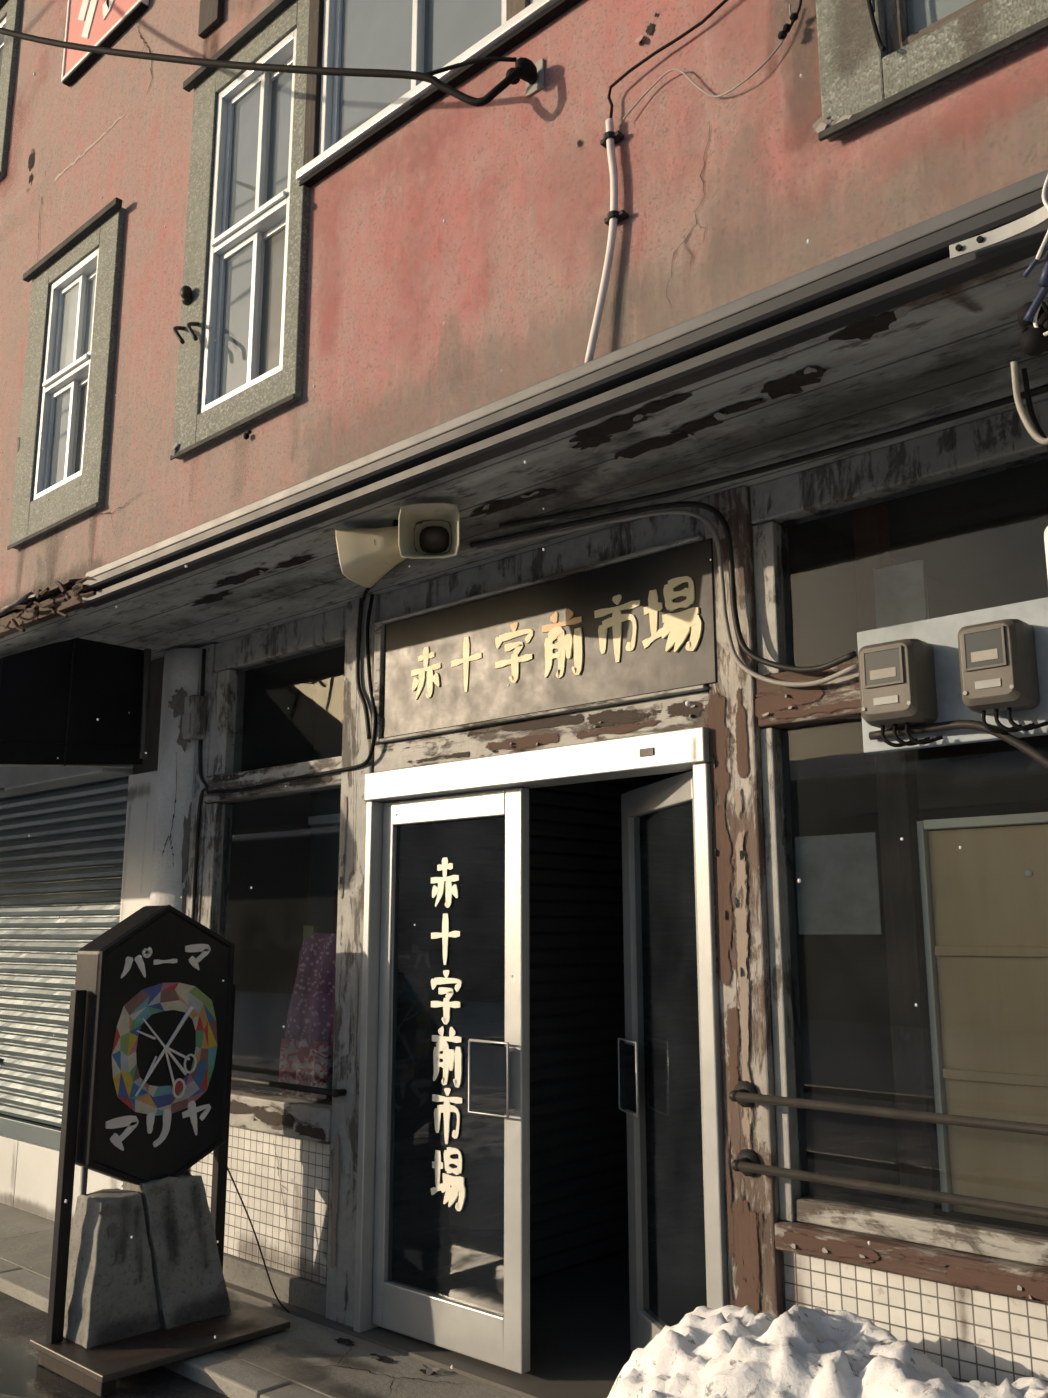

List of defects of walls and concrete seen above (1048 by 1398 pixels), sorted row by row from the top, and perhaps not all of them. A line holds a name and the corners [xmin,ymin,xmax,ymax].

crack [666,124,710,309]
peeling [828,305,909,343]
peeling [568,366,831,465]
peeling [168,687,191,752]
peeling [181,802,192,914]
peeling [408,685,861,1092]
peeling [724,1107,763,1314]
peeling [782,1228,1048,1300]